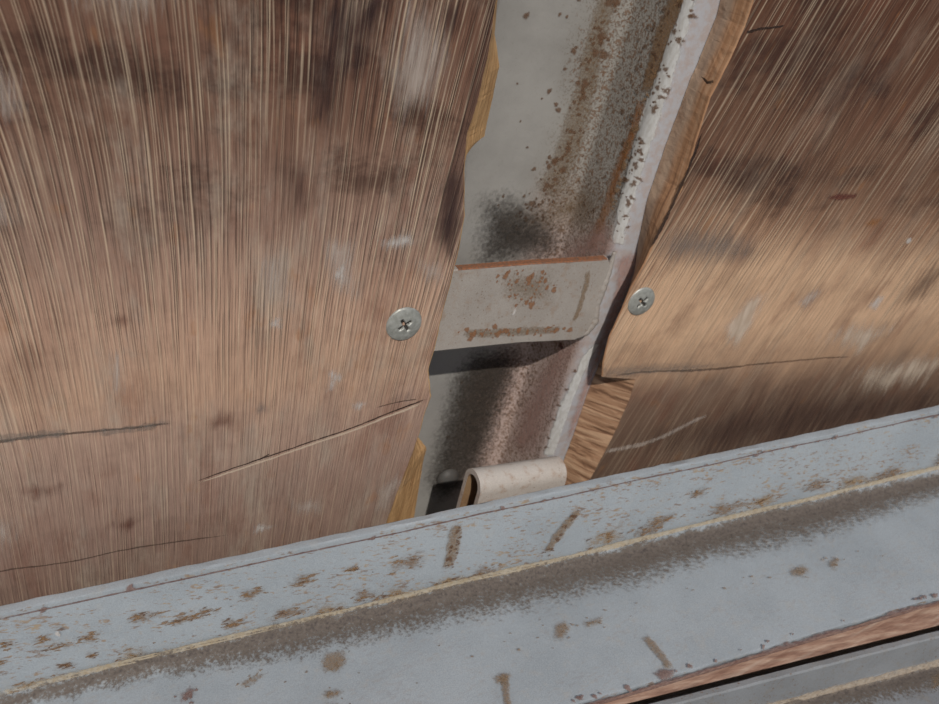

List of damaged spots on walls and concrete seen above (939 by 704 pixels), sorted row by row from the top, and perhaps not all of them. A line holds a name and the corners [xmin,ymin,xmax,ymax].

rust [519,0,681,233]
rust [455,244,607,349]
crack [203,401,421,481]
rust [2,414,939,704]